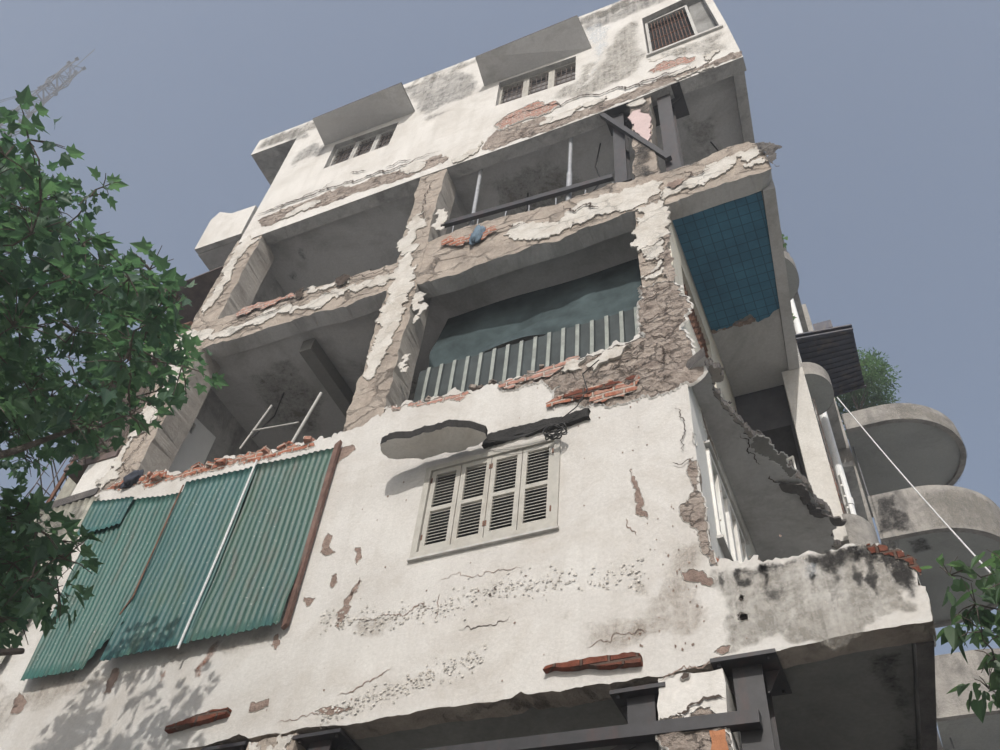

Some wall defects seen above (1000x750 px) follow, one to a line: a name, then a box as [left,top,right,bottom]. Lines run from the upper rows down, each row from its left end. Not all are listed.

peeling [201,47,742,315]
flaking render [95,142,845,515]
flaking render [671,406,721,608]
flaking render [320,533,336,556]
crack [362,567,522,621]
peeling [308,539,657,634]
spalling [736,594,749,622]
leakage [719,541,915,644]
crack [658,656,720,681]
crack [277,669,390,723]
crack [668,694,726,718]
flaking render [655,727,733,750]